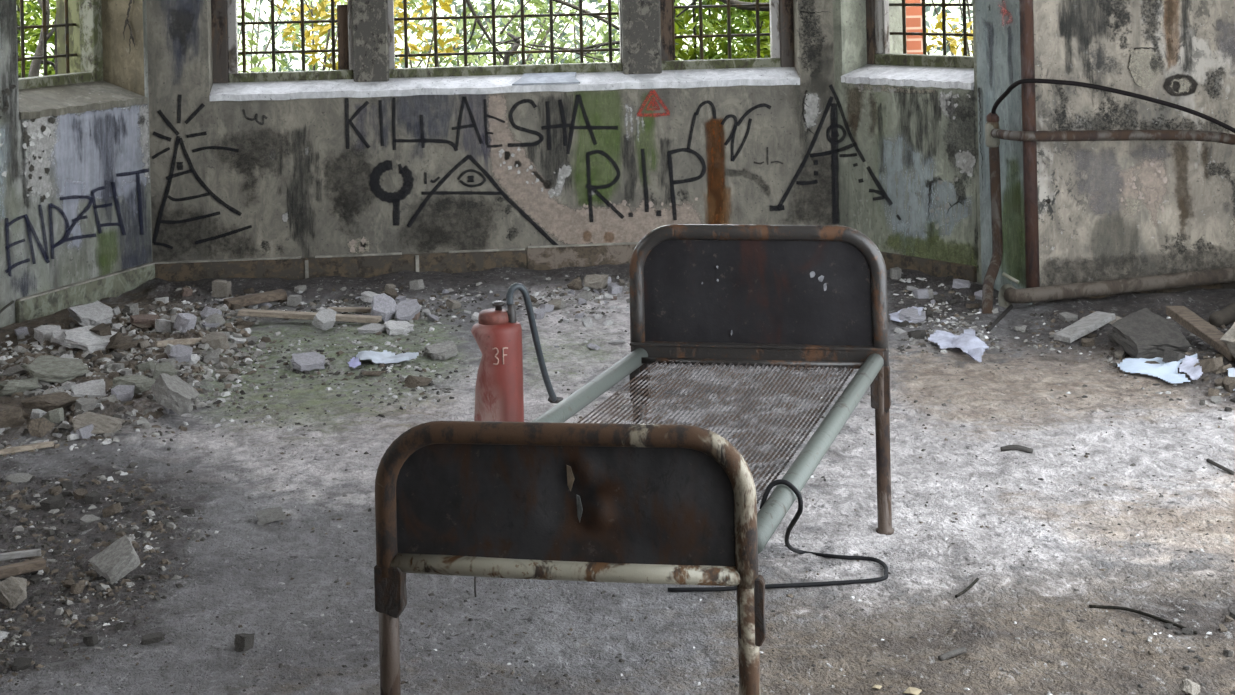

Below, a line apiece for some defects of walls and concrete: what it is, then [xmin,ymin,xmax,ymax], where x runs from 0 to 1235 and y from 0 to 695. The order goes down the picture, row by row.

leakage [166,0,200,82]
peeling [0,85,16,192]
peeling [21,116,59,207]
leakage [528,95,599,207]
peeling [487,93,702,244]
leakage [622,95,671,204]
leakage [1044,0,1235,286]